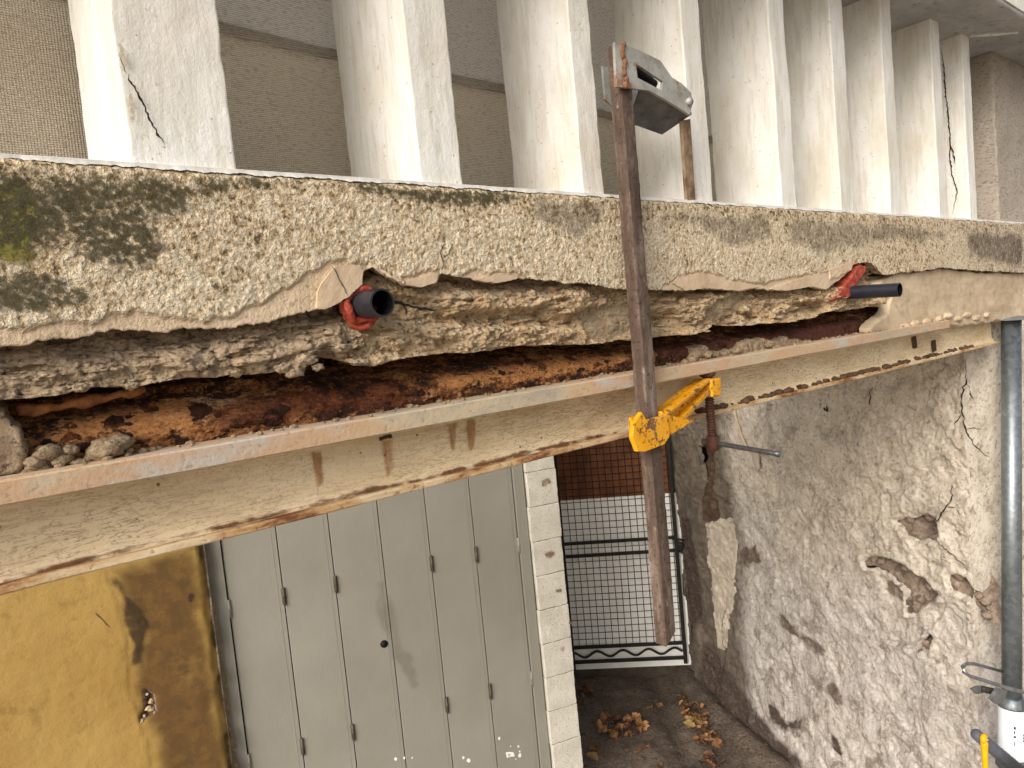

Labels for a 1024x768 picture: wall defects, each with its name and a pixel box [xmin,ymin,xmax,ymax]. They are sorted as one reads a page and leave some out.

crack [120,58,165,144]
crack [941,52,958,204]
spalling [0,265,631,400]
rust [653,316,870,361]
spalling [648,261,887,338]
rust [39,352,630,453]
crack [953,357,989,457]
spalling [897,515,939,541]
spalling [865,556,939,613]
spalling [950,574,1001,624]
water stain [113,544,238,768]